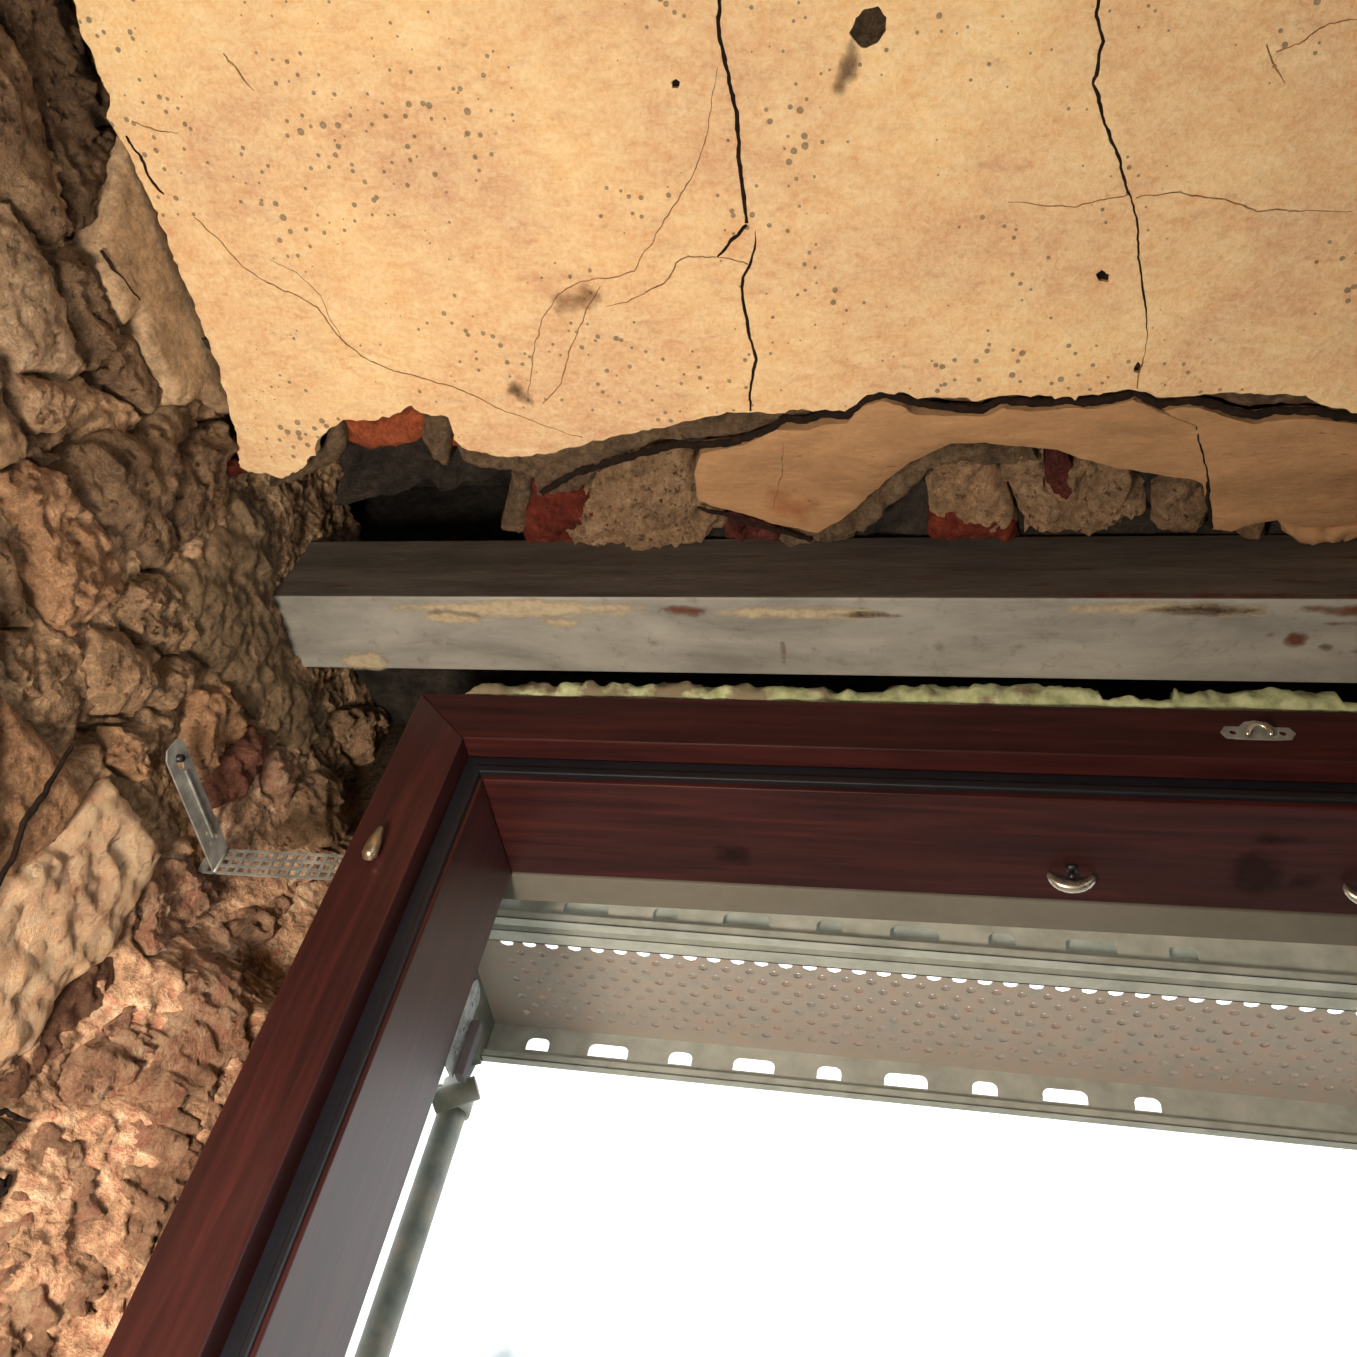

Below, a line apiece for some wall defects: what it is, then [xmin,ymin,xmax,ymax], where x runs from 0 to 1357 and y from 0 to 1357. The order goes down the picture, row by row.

leakage [836,53,856,89]
crack [125,121,174,195]
crack [194,0,1357,542]
spalling [269,389,1357,551]
spalling [0,0,390,1263]
crack [0,746,73,886]
crack [0,1108,32,1122]
crack [0,1174,13,1204]
spalling [0,1191,131,1357]